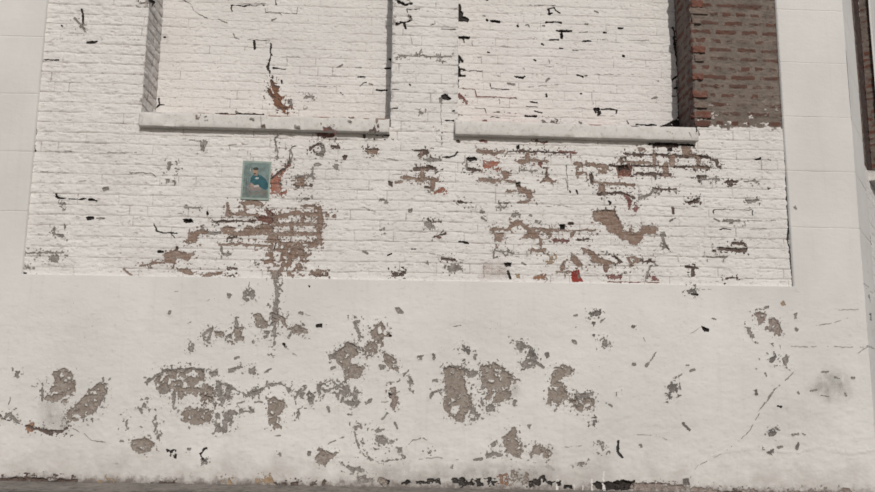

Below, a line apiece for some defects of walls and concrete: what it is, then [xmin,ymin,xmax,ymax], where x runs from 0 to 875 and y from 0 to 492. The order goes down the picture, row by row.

peeling [361,118,399,161]
peeling [388,144,771,283]
peeling [573,308,614,350]
spalling [744,306,791,377]
spalling [0,397,23,425]
crack [0,414,103,442]
spalling [31,368,111,427]
spalling [264,317,414,485]
spalling [401,336,622,489]